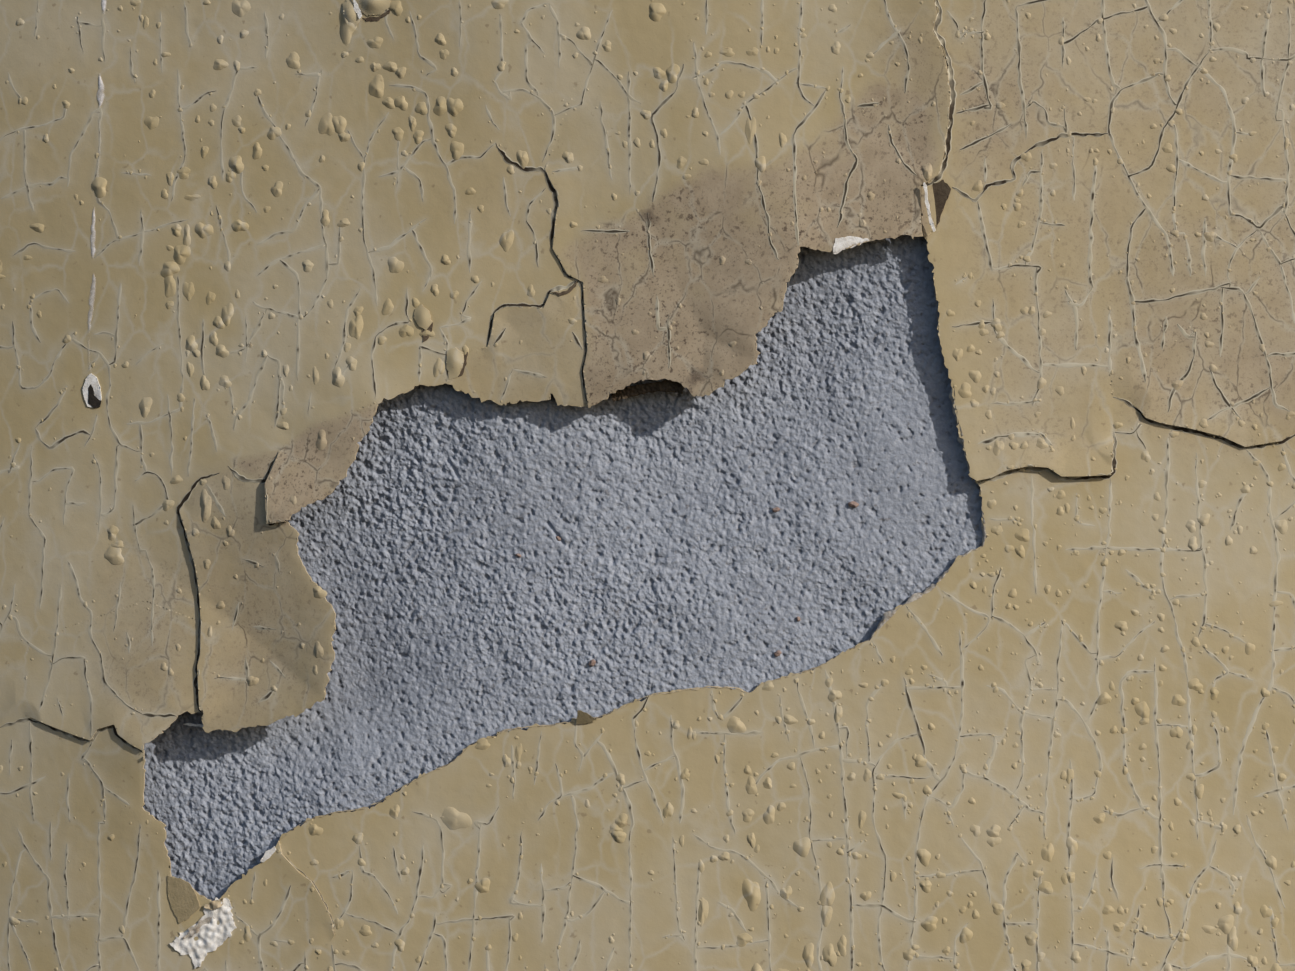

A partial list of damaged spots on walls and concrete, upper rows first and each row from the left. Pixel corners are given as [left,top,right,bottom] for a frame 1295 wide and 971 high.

peeling [82,373,102,408]
peeling [0,602,199,751]
crack [0,0,879,971]
peeling [143,0,1113,971]
crack [756,0,1295,971]